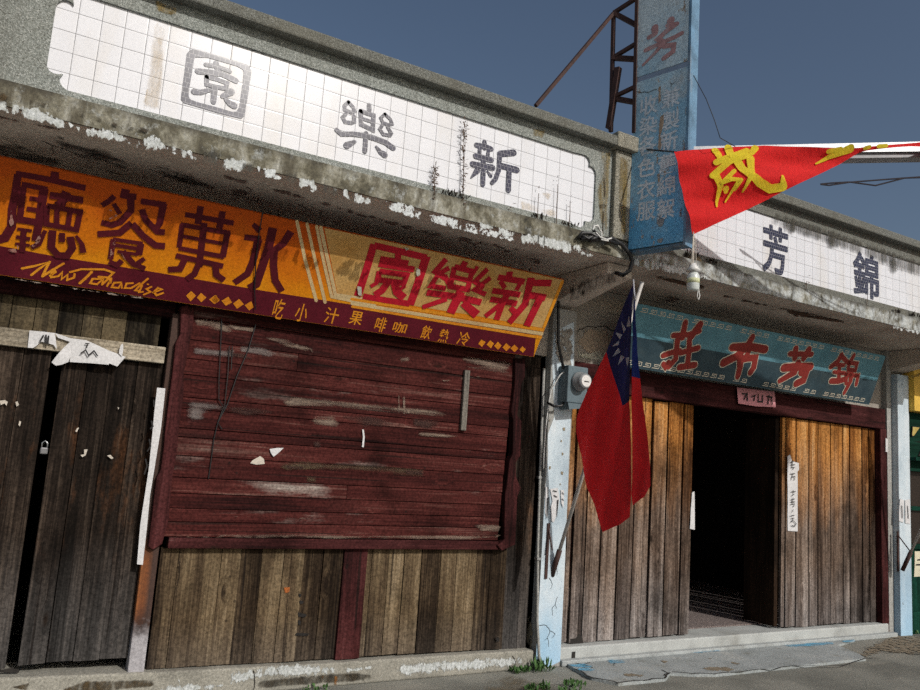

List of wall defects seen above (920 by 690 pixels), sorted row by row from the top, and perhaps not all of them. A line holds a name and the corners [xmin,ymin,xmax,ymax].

peeling [0,101,196,160]
peeling [161,663,335,690]
peeling [397,657,522,676]
crack [576,660,799,683]